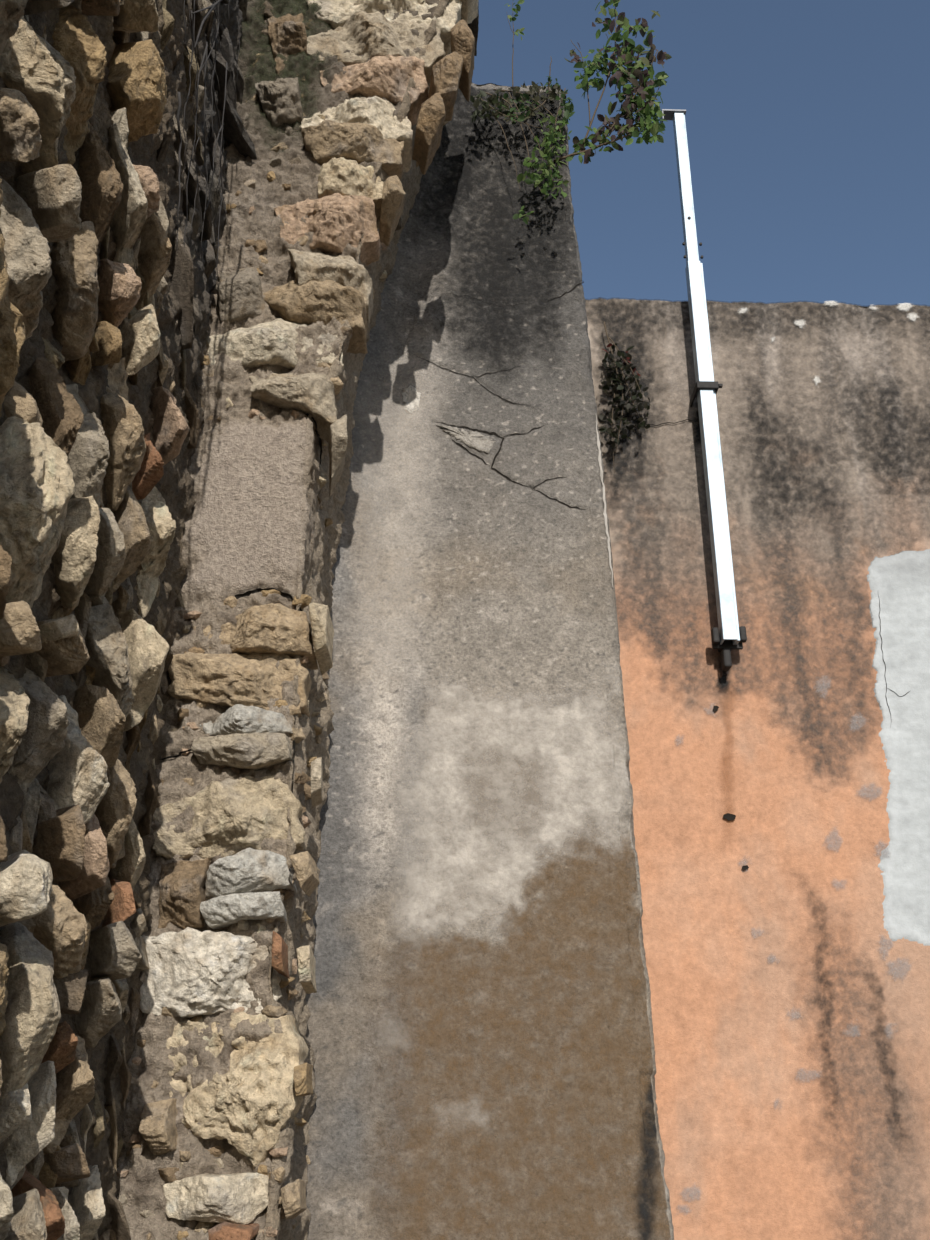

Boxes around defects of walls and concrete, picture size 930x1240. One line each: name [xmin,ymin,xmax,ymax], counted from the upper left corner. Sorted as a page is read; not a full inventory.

water stain [413,86,580,362]
crack [413,354,580,509]
water stain [595,298,930,773]
water stain [391,682,671,1240]